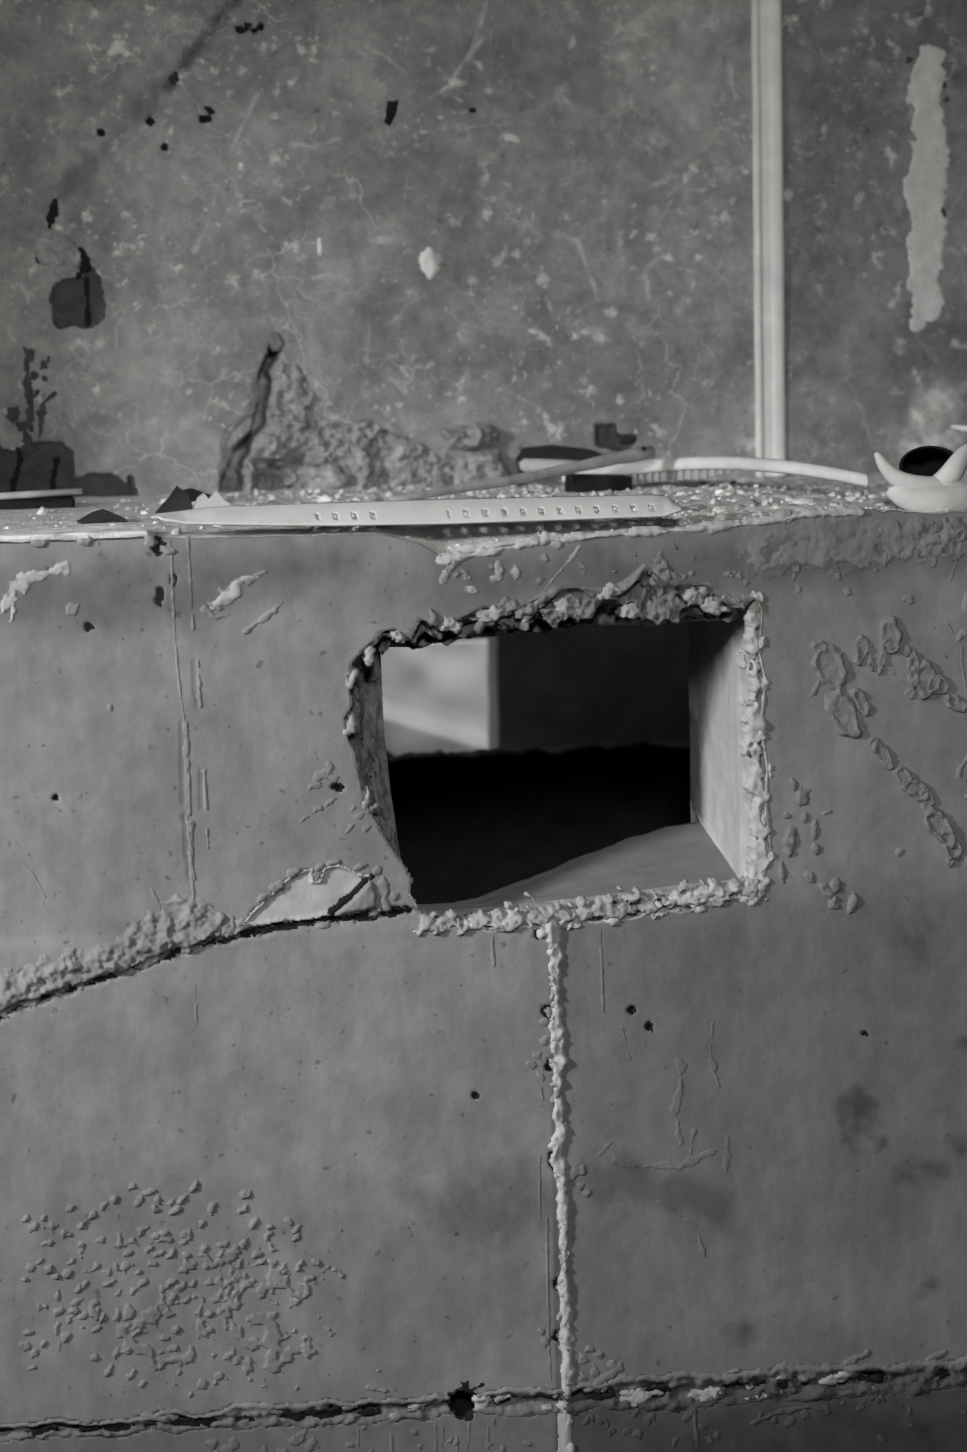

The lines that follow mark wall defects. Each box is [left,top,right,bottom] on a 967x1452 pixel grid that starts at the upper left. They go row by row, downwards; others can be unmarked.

peeling [33,188,106,330]
peeling [0,346,138,497]
spalling [183,330,512,503]
spalling [199,569,268,620]
spalling [224,503,866,940]